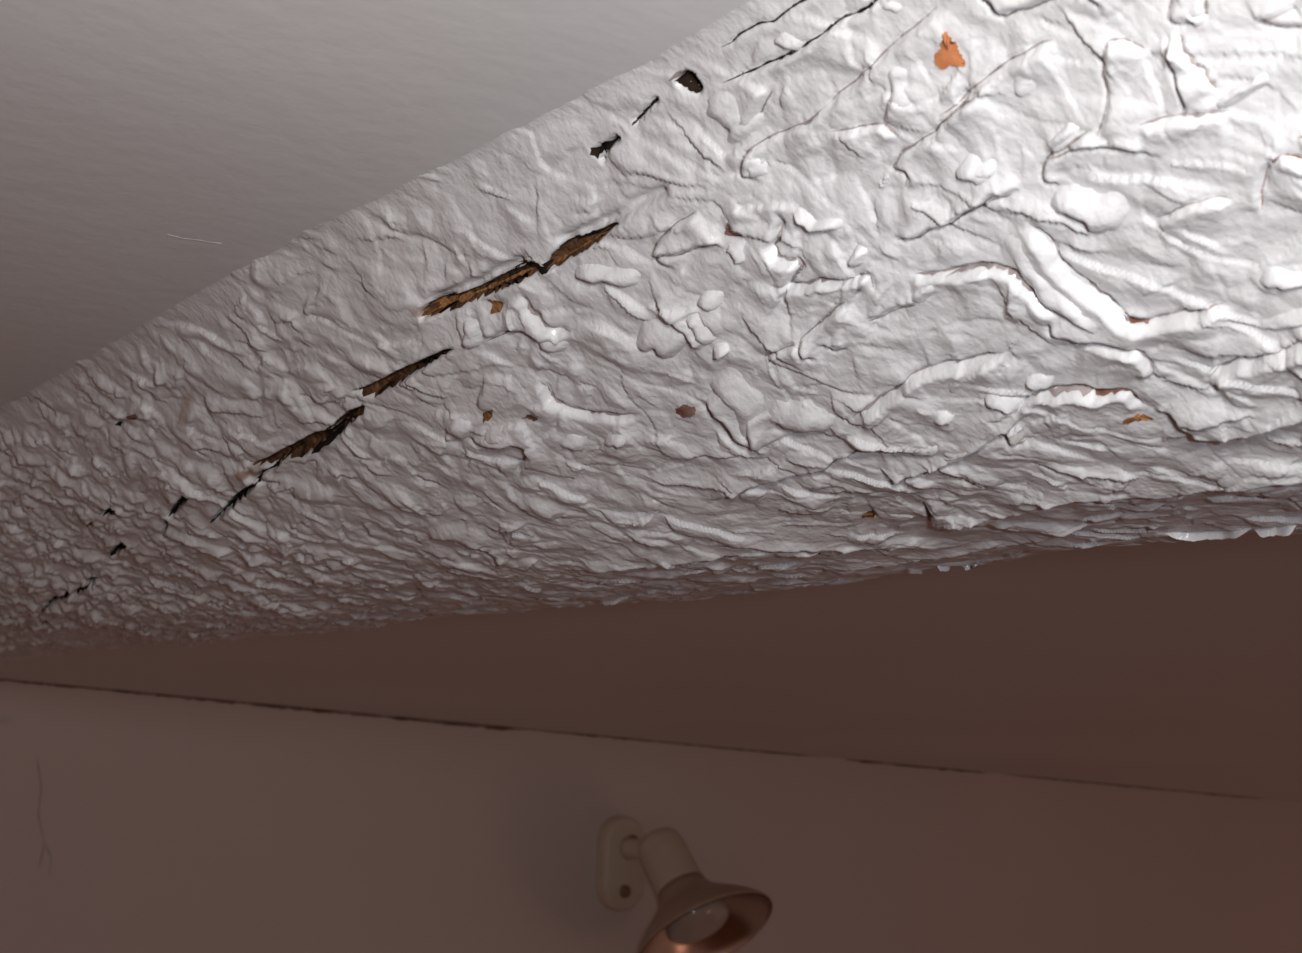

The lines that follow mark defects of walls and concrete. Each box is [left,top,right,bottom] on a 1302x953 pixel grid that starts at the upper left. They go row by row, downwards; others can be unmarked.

crack [590,98,659,160]
crack [722,0,1053,186]
peeling [934,32,966,70]
crack [897,0,1229,240]
crack [165,349,452,530]
crack [422,222,618,341]
crack [765,215,914,361]
crack [852,352,1003,418]
crack [915,261,1058,338]
crack [1005,224,1229,444]
crack [33,508,126,624]
crack [0,679,1263,799]